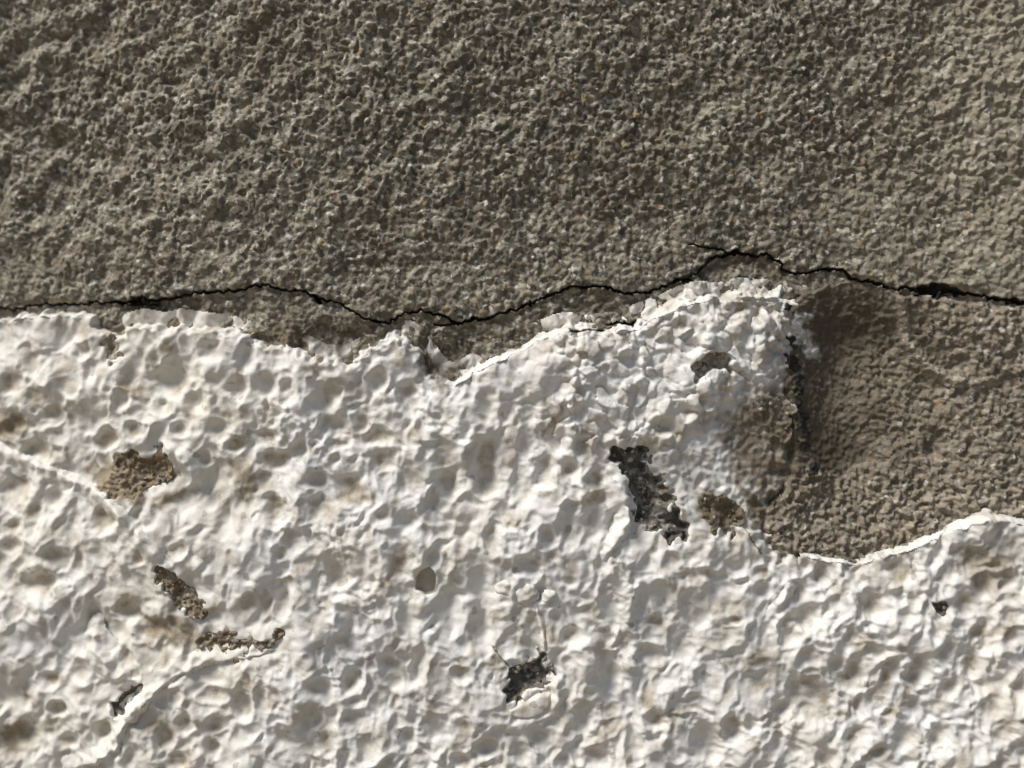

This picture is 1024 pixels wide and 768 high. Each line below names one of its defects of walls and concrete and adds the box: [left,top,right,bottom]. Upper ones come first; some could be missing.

crack [0,244,1024,326]
peeling [444,298,714,386]
crack [569,320,636,332]
spalling [691,352,732,383]
spalling [750,279,1024,565]
spalling [97,443,180,500]
spalling [608,445,690,545]
spalling [699,490,746,539]
spalling [155,566,207,620]
spalling [196,626,285,664]
hole [111,683,143,717]
hole [502,644,556,719]